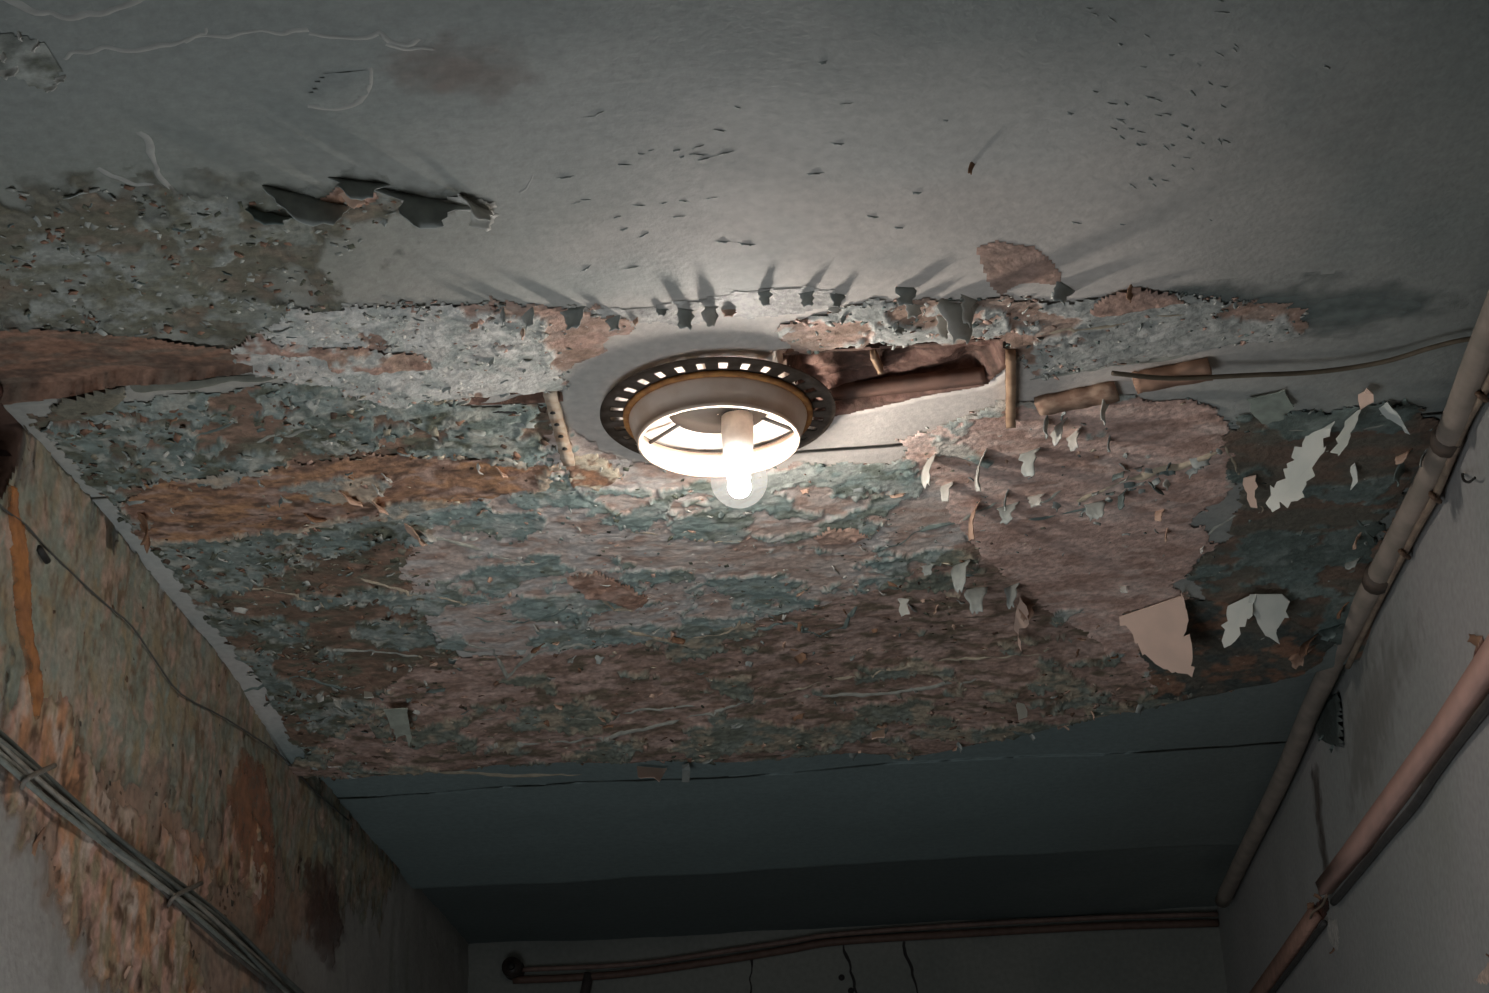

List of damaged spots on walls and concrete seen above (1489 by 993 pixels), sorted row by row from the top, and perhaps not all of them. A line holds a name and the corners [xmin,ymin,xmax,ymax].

crack [63,27,435,60]
peeling [1092,90,1231,189]
spalling [0,173,1440,934]
peeling [4,772,211,993]